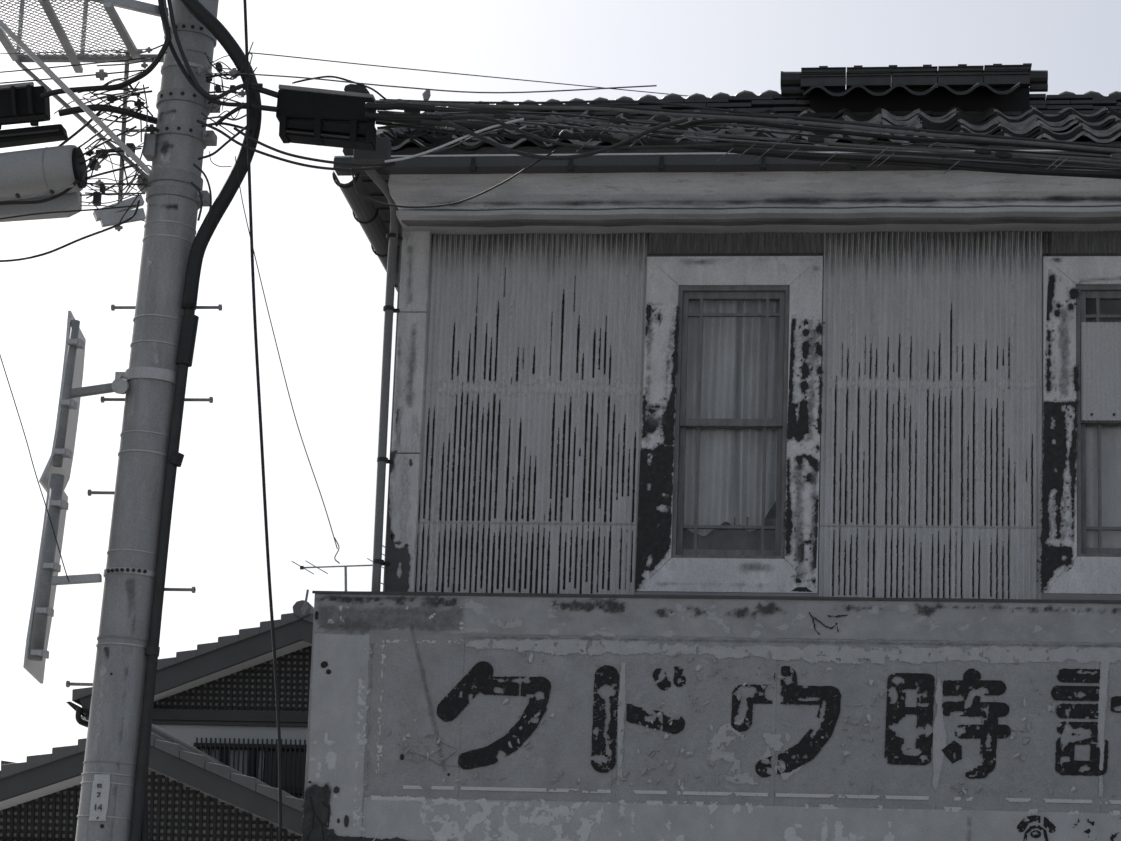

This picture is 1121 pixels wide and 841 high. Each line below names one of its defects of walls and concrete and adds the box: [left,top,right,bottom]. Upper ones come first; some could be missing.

peeling [384,268,679,594]
peeling [783,274,1080,599]